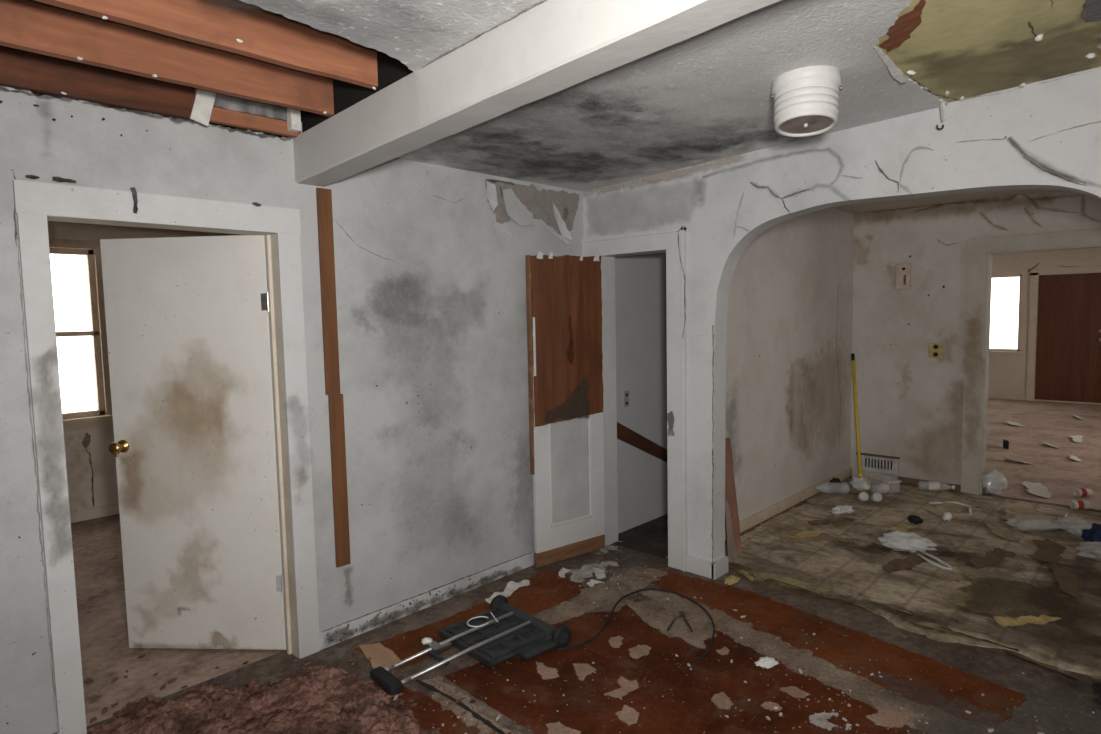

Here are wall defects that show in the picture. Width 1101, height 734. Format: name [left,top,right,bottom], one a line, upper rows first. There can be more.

spalling [1081,0,1101,49]
peeling [485,179,579,248]
crack [750,182,810,215]
crack [976,138,1086,225]